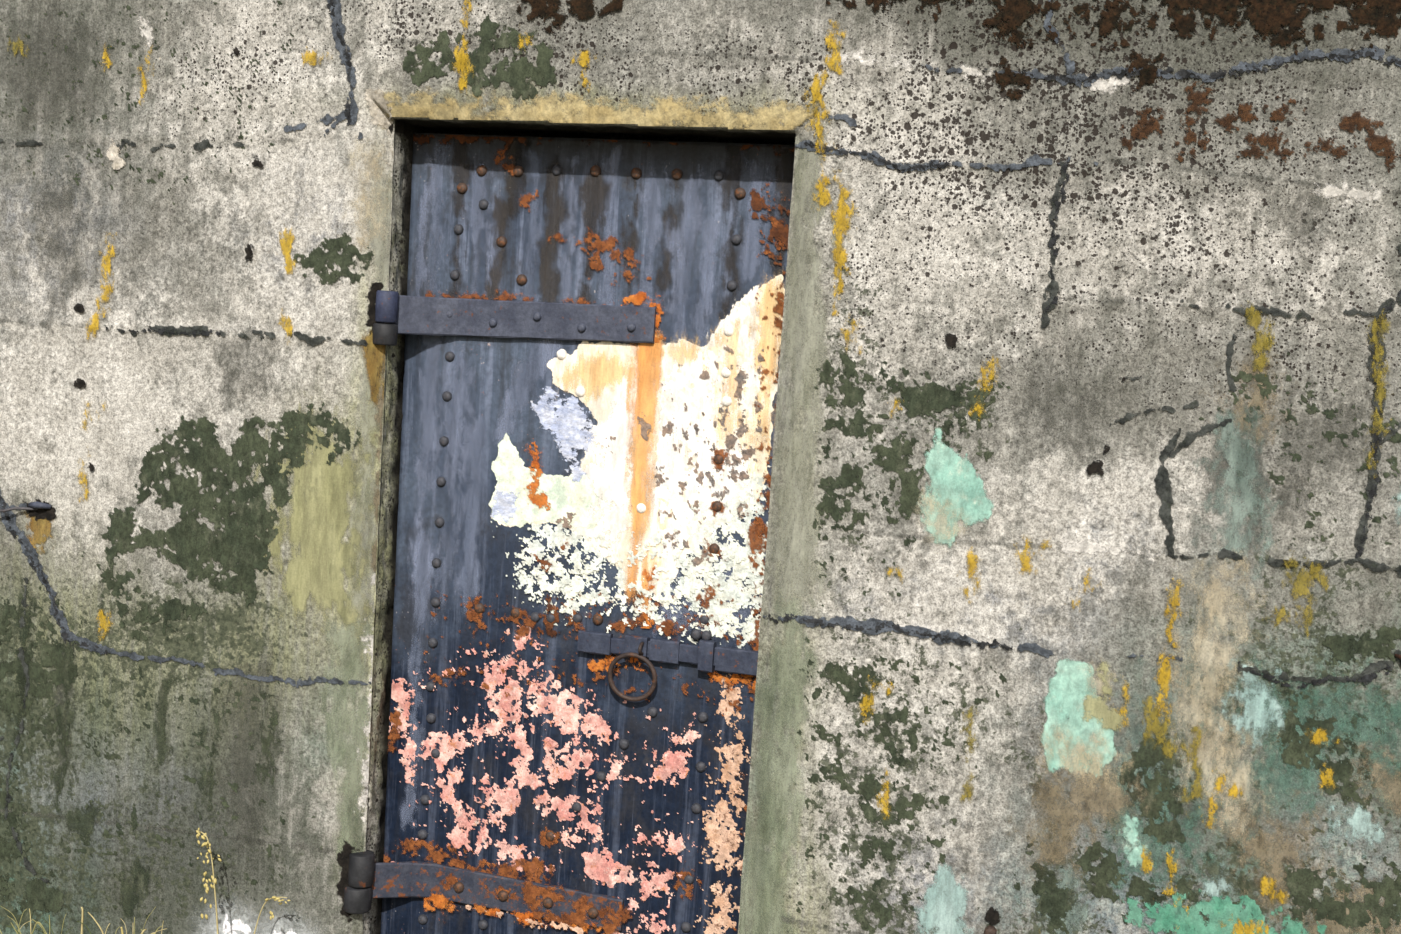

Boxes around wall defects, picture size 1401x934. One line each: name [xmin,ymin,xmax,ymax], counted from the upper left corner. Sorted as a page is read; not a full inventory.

crack [283,0,363,139]
rust [413,134,551,176]
crack [795,114,1098,329]
rust [423,183,790,722]
peeling [489,274,785,648]
peeling [918,428,994,547]
crack [1110,291,1401,577]
crack [763,613,1054,658]
rust [388,710,402,753]
peeling [389,625,750,934]
peeling [1041,659,1127,777]
rust [384,826,632,934]